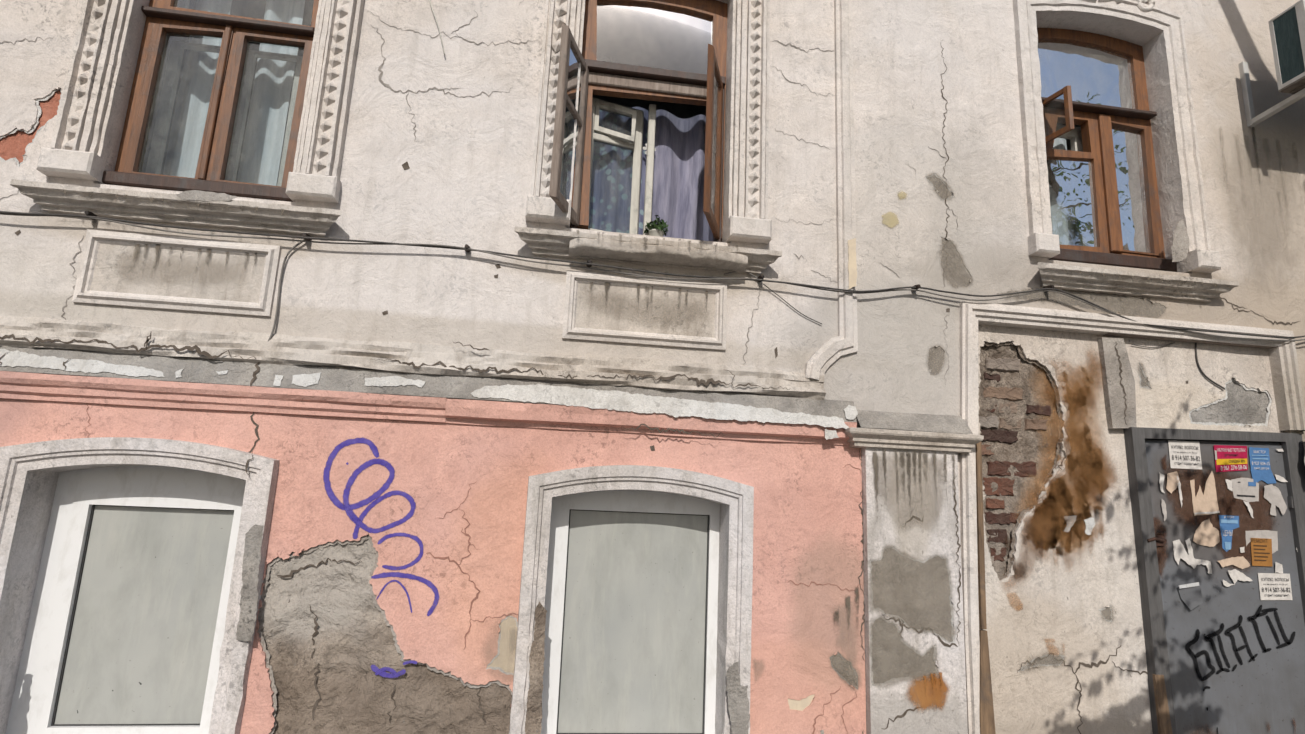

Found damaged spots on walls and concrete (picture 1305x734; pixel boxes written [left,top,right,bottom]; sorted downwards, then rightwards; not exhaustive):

spalling [0,87,62,168]
crack [370,0,539,142]
crack [912,39,958,385]
crack [0,235,261,476]
peeling [471,384,858,440]
leakage [873,450,956,510]
flaking render [978,341,1063,580]
spalling [1189,377,1272,428]
spalling [236,524,547,734]
crack [426,481,518,649]
spalling [829,545,955,690]
crack [1017,646,1148,734]